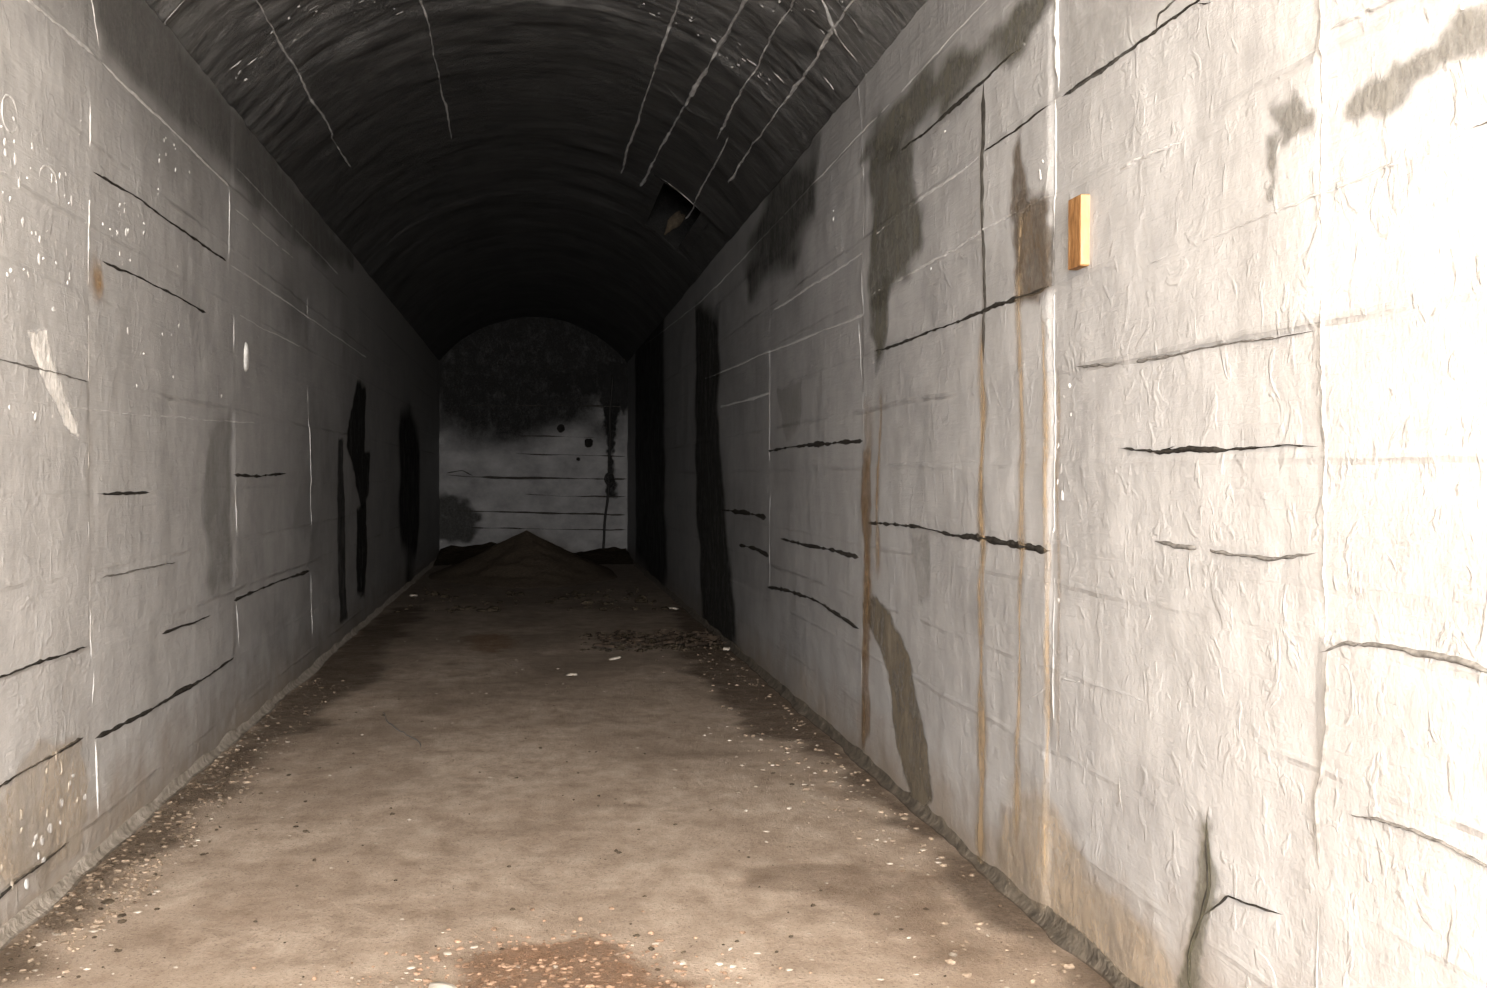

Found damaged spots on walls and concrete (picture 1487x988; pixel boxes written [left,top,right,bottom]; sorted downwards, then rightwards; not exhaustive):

damp [1347,9,1487,117]
damp [863,0,1052,360]
crack [0,647,85,678]
rust [861,422,881,738]
rust [977,348,985,858]
rust [1015,226,1024,825]
rust [1042,336,1057,517]
crack [1123,444,1318,455]
crack [1314,641,1487,868]
damp [948,858,1047,936]